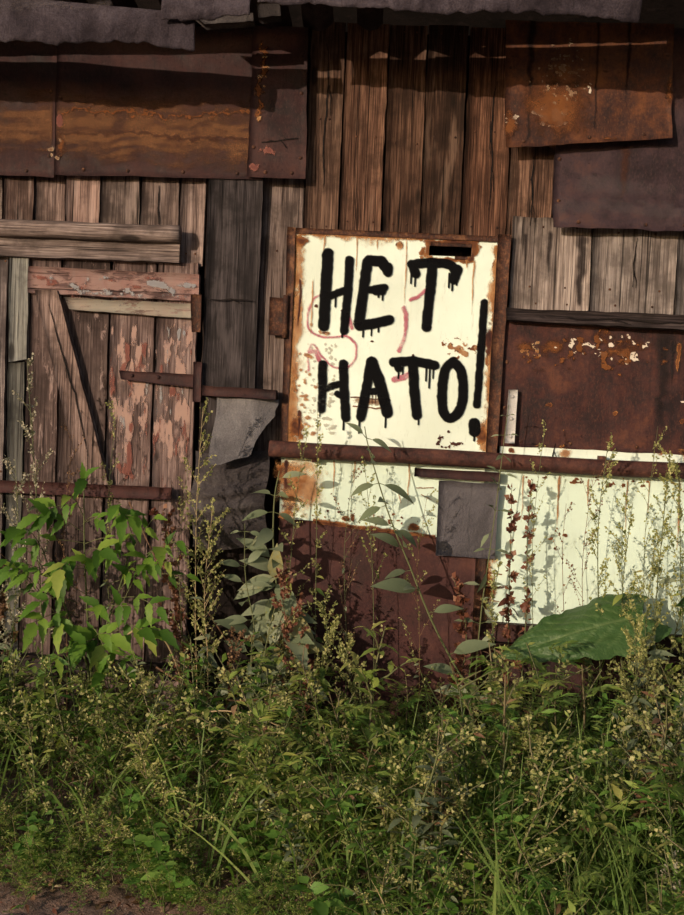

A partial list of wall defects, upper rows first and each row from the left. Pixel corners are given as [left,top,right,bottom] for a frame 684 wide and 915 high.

rust [0,26,308,180]
rust [503,20,684,231]
peeling [33,275,196,300]
peeling [109,324,193,480]
rust [288,234,482,442]
rust [476,245,497,452]
rust [497,321,684,459]
rust [273,458,435,538]
rust [557,476,650,527]